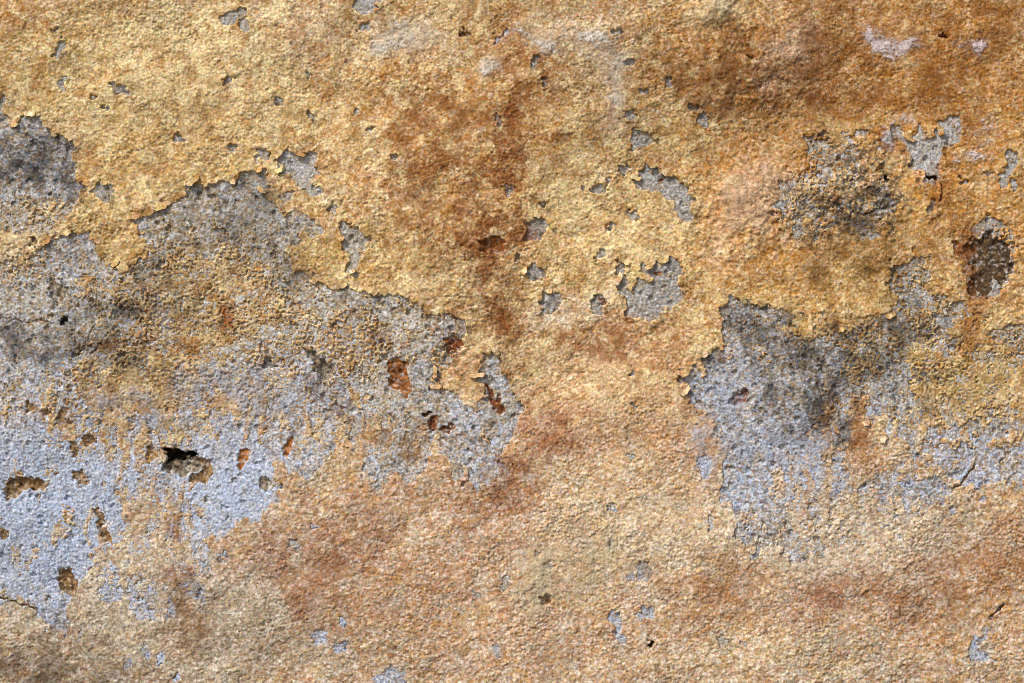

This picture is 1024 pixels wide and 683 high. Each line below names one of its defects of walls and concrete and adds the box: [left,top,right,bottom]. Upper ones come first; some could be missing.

rust [484,99,528,185]
peeling [582,110,697,222]
peeling [770,130,900,243]
peeling [890,115,962,214]
rust [455,232,497,278]
peeling [591,249,686,322]
peeling [0,94,525,642]
peeling [677,215,1024,565]